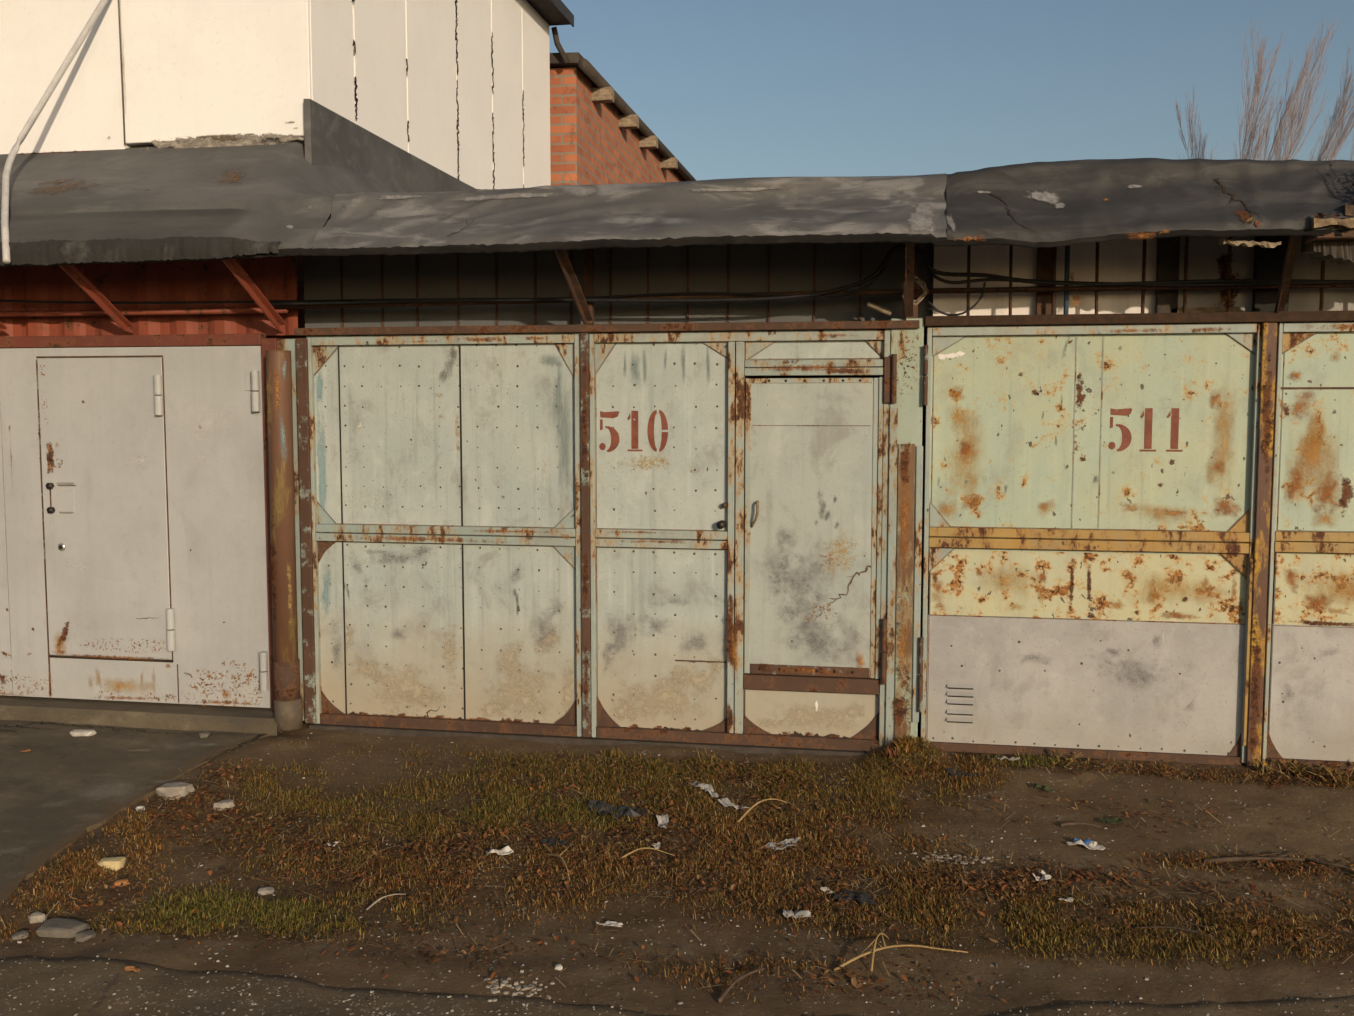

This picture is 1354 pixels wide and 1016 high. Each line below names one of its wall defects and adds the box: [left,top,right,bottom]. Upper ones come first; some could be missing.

rust [1072,362,1108,480]
rust [1261,355,1310,481]
rust [1288,429,1354,522]
rust [57,622,161,660]
rust [725,594,738,665]
crack [816,565,877,618]
rust [1069,559,1095,618]
rust [1289,583,1354,626]
rust [0,651,51,695]
rust [185,660,262,707]
rust [893,698,907,727]
rust [1249,646,1261,754]